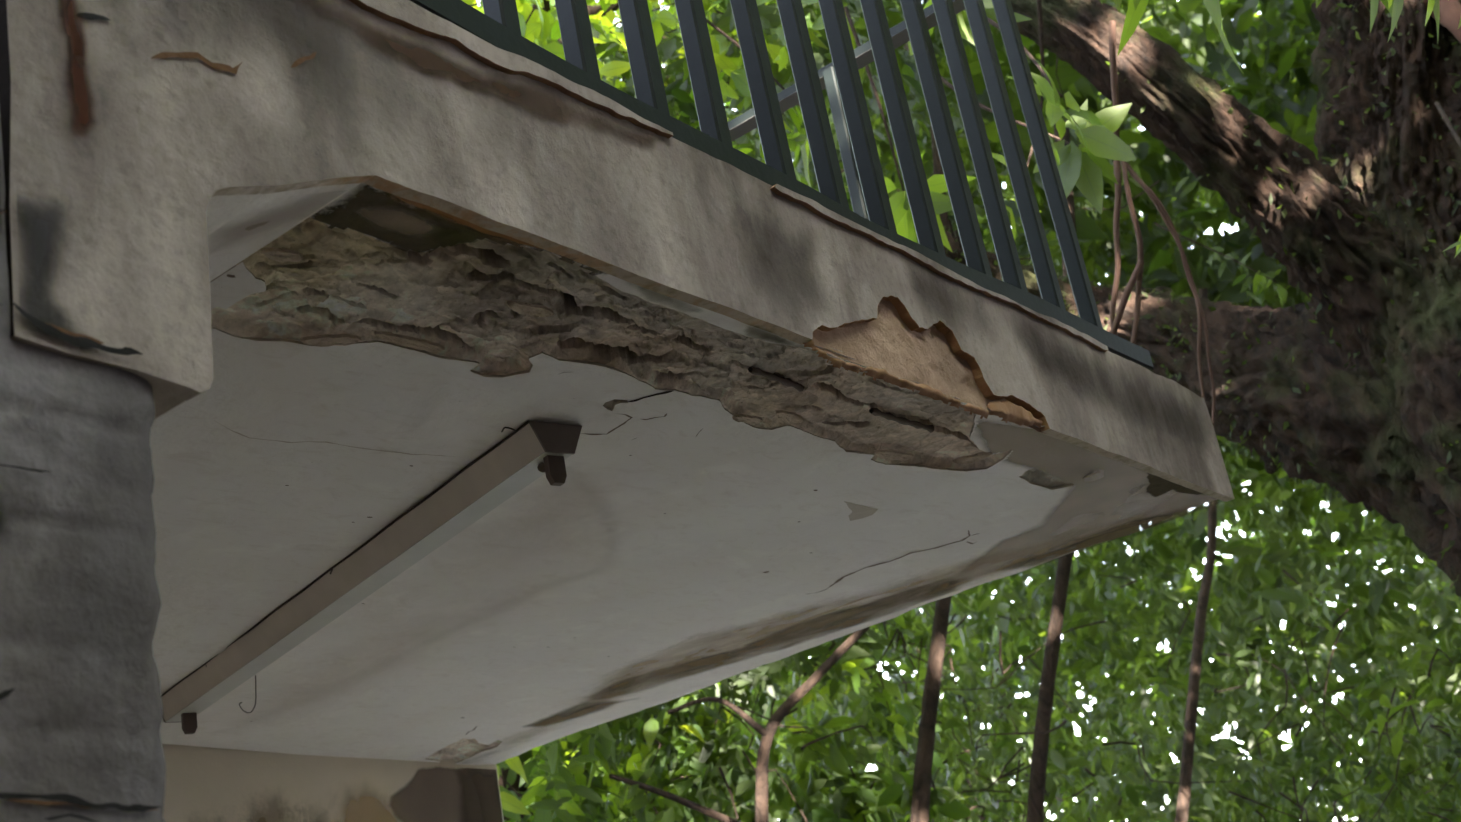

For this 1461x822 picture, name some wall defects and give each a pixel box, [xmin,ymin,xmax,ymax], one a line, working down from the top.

rust [60,0,94,133]
crack [151,52,242,74]
crack [349,0,673,138]
spalling [211,217,1043,470]
crack [217,422,455,457]
crack [585,390,674,440]
spalling [1020,468,1099,487]
water stain [529,422,1217,727]
crack [809,530,979,594]
crack [0,688,14,700]
crack [0,793,161,822]